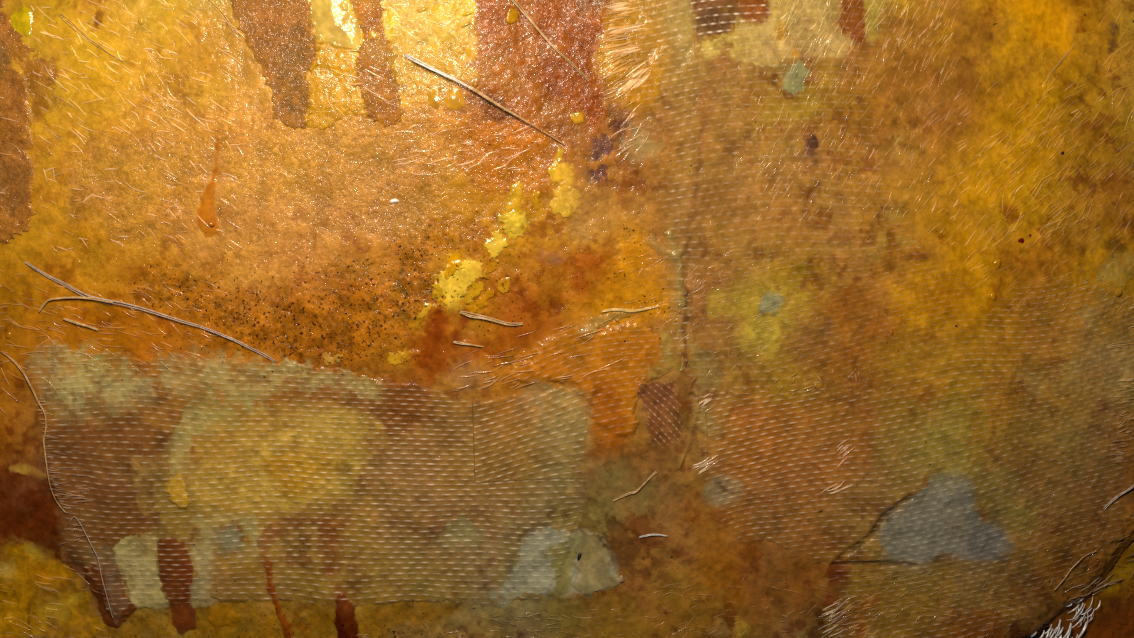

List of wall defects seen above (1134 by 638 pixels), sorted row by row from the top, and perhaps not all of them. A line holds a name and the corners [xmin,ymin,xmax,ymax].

rust [440,0,609,215]
leakage [783,182,835,231]
leakage [805,127,821,150]
leakage [838,0,1134,329]
leakage [703,275,843,373]